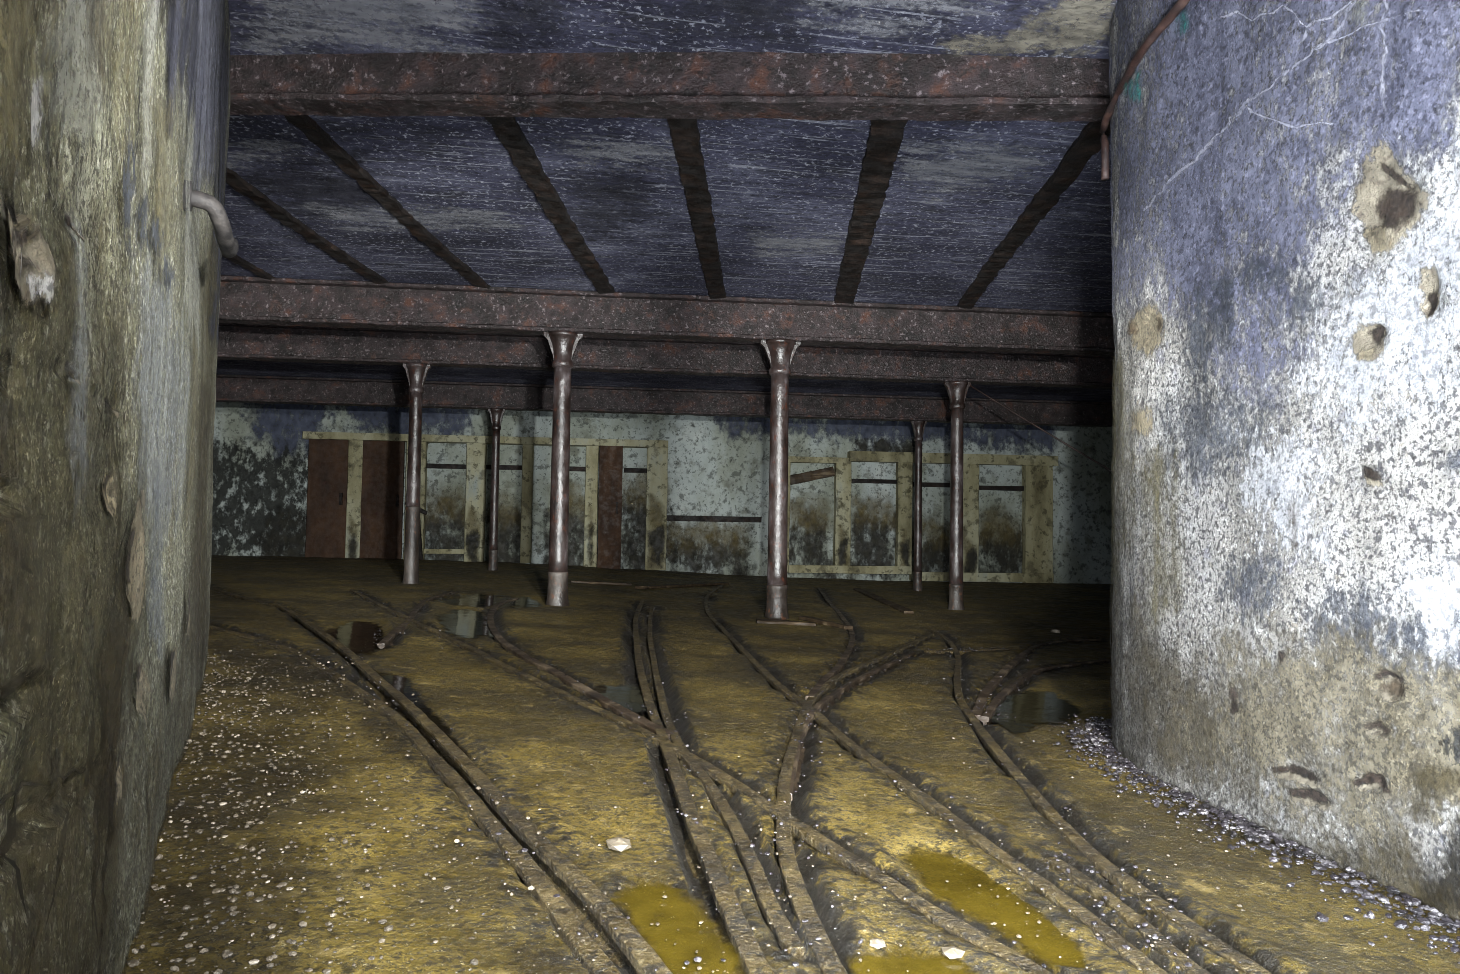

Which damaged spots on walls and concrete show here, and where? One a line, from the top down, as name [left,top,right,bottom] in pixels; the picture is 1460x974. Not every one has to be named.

spalling [0,194,56,306]
leakage [304,203,522,232]
leakage [567,140,675,168]
leakage [750,230,844,258]
leakage [897,141,1045,201]
spalling [1351,140,1430,255]
spalling [1418,265,1440,319]
spalling [1351,323,1386,361]
leakage [0,0,488,974]
leakage [1416,729,1460,820]
leakage [1266,815,1460,921]